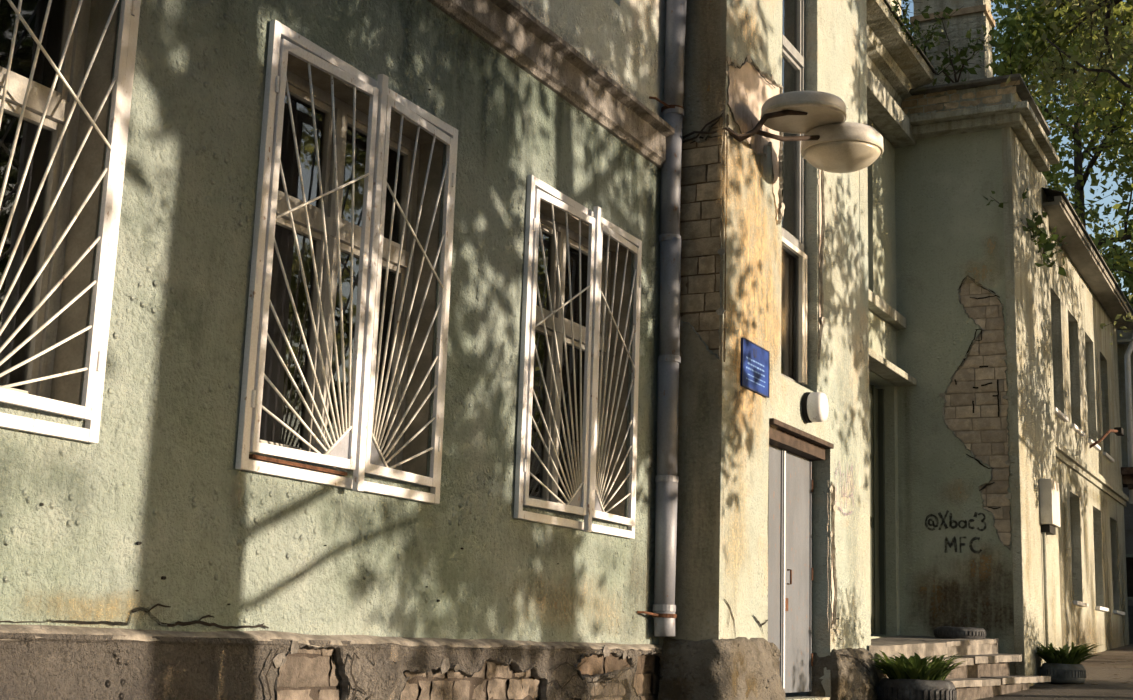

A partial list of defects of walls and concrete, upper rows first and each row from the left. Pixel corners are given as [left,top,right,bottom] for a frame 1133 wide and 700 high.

spalling [680,55,785,362]
spalling [939,277,1012,551]
crack [0,603,279,700]
crack [550,654,636,700]
leakage [930,580,1014,631]